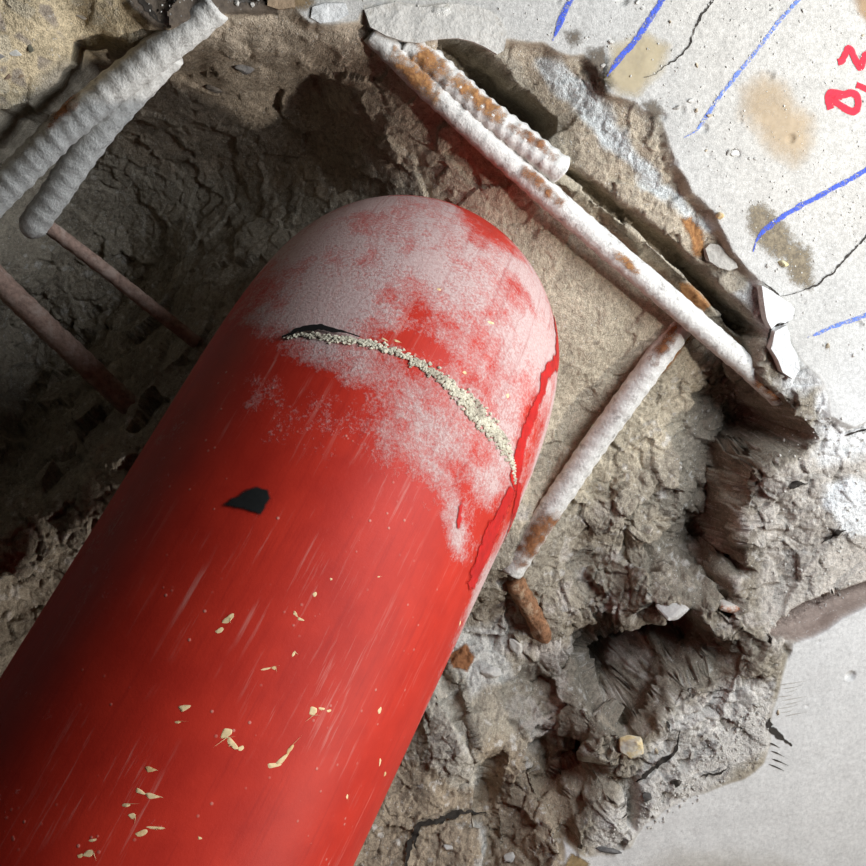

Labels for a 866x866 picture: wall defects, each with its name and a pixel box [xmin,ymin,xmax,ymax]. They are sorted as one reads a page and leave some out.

water stain [129,0,198,30]
water stain [211,0,279,15]
rust [611,38,664,91]
crack [644,0,714,78]
spalling [0,0,228,239]
spalling [364,30,783,406]
rust [682,217,704,257]
rust [678,282,710,312]
water stain [747,204,815,289]
crack [762,236,866,296]
spalling [747,384,866,677]
spalling [566,675,783,858]